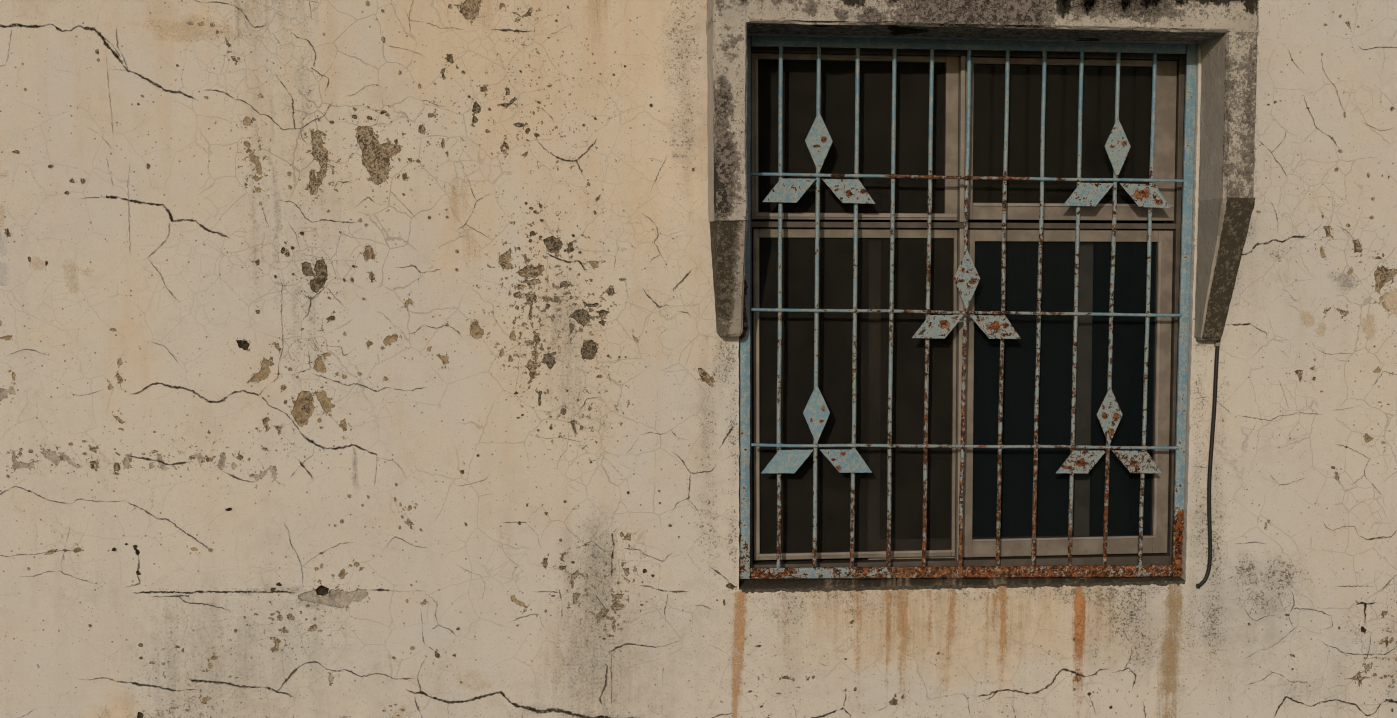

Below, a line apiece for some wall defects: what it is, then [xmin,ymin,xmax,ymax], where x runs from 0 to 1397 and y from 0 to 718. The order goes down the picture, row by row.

crack [0,1,330,130]
spalling [352,107,420,196]
water stain [716,26,744,215]
water stain [771,0,817,16]
water stain [834,0,1185,26]
spalling [274,231,375,293]
spalling [498,202,627,434]
corrosion [740,277,748,340]
crack [130,283,422,484]
crack [94,600,656,718]
corrosion [732,591,746,718]
corrosion [1074,586,1101,680]